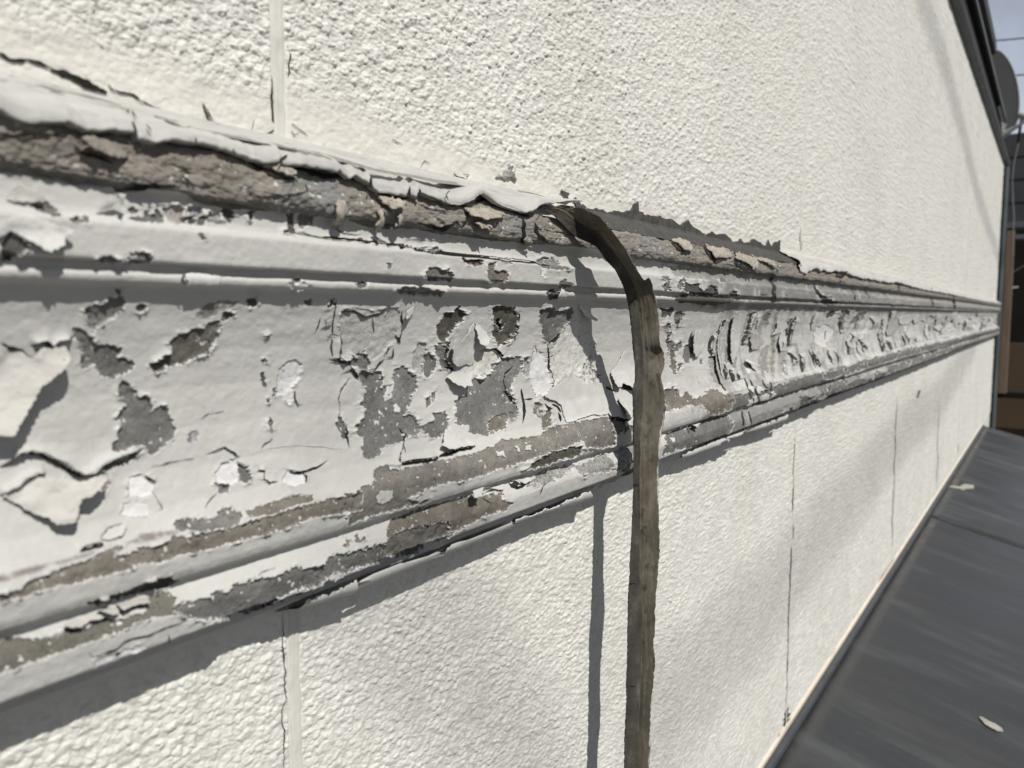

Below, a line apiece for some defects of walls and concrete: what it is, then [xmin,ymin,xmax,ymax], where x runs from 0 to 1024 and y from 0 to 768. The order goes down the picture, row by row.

peeling [0,71,802,768]
peeling [819,295,871,329]
peeling [728,329,998,412]
spalling [800,269,1001,311]
crack [880,411,897,580]
crack [786,447,795,701]
crack [280,615,288,766]